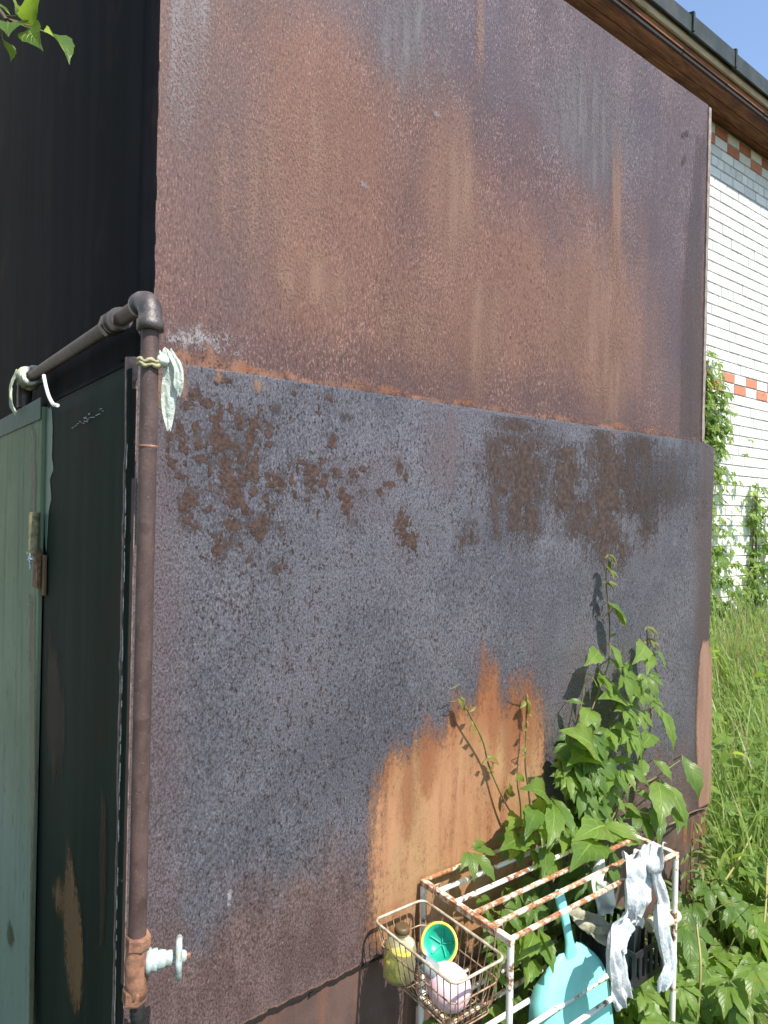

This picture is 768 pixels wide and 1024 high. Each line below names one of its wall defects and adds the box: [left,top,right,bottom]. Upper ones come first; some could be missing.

rust [174,343,677,438]
rust [365,649,547,959]